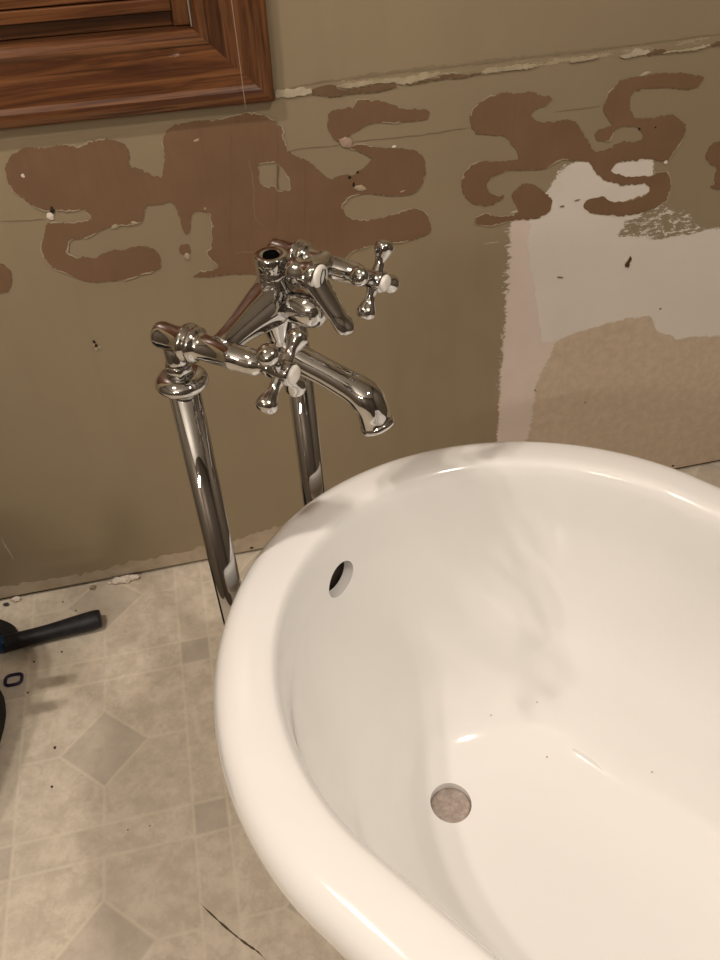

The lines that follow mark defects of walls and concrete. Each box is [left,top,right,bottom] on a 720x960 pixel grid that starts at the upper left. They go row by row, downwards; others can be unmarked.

peeling [5,98,432,283]
peeling [461,71,704,227]
peeling [706,141,720,190]
peeling [0,264,12,293]
peeling [524,316,720,468]
crack [200,903,266,960]